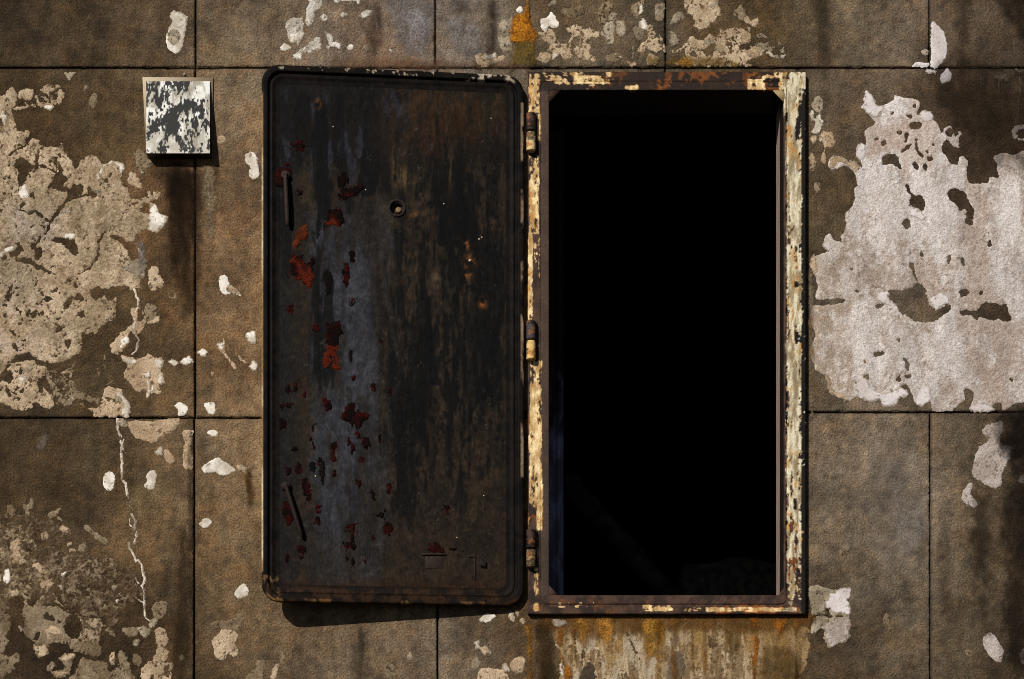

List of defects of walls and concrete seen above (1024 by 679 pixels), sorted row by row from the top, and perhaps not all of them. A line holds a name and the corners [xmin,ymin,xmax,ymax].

corrosion [509,1,537,64]
peeling [535,0,786,67]
peeling [0,72,260,475]
crack [131,248,143,355]
corrosion [287,224,315,289]
corrosion [341,248,357,307]
peeling [809,90,1024,508]
corrosion [308,397,382,477]
crack [116,418,150,621]
peeling [0,496,185,679]
corrosion [526,615,815,679]
peeling [552,585,852,679]